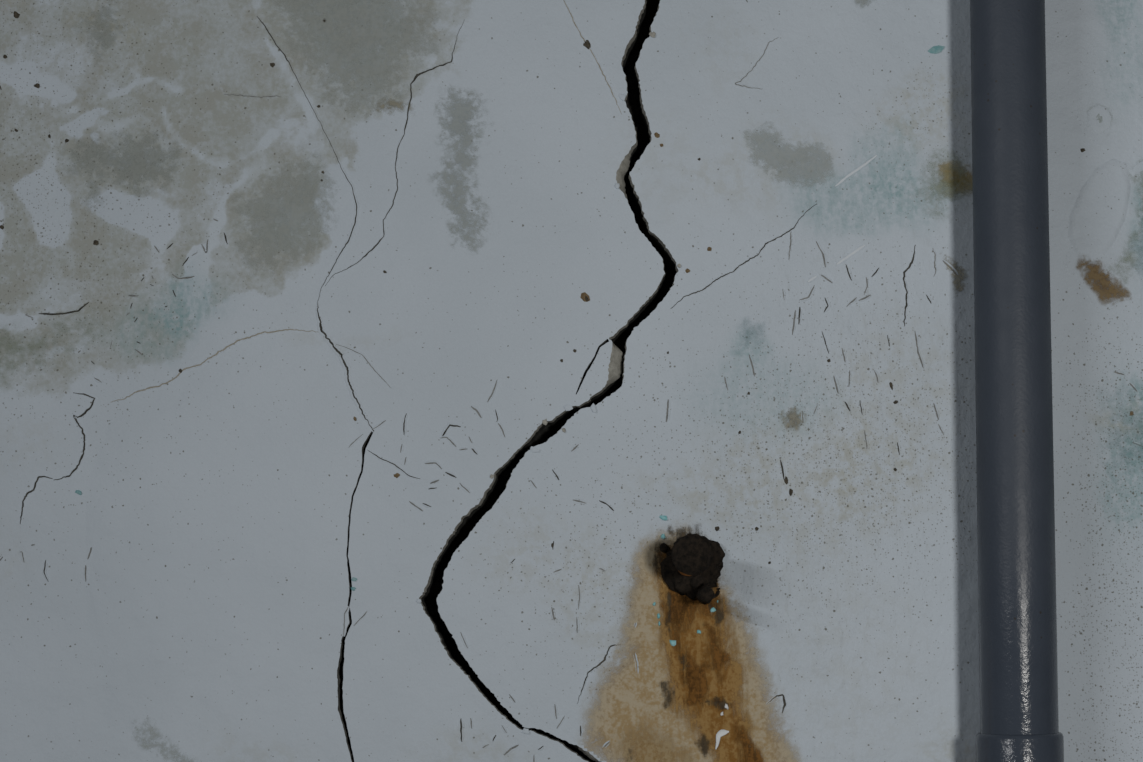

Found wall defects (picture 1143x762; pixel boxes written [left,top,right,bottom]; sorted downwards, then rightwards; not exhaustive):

crack [20,16,465,762]
damp [442,94,480,242]
crack [416,0,817,762]
rust [585,515,797,762]